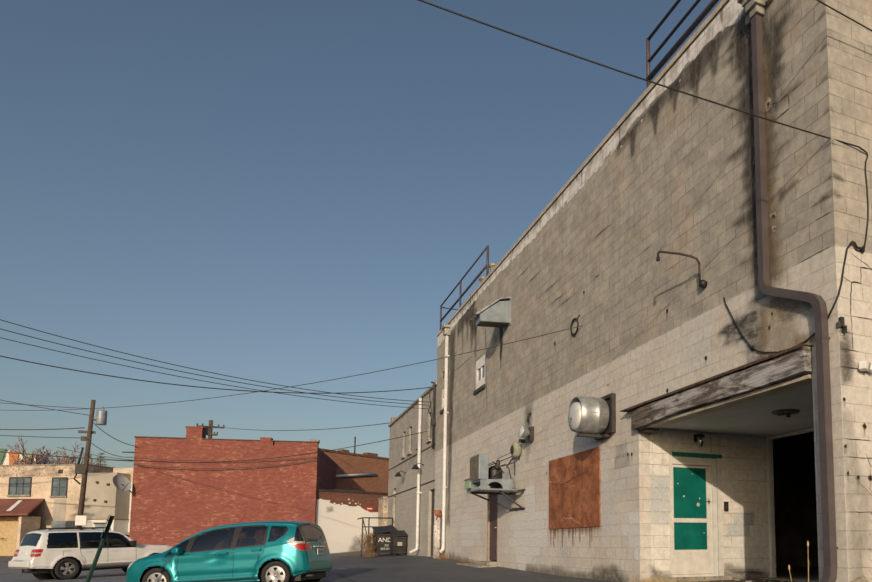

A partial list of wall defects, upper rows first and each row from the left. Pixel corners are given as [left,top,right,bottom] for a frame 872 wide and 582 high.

damp [639,13,758,273]
damp [762,10,781,196]
crack [840,251,872,369]